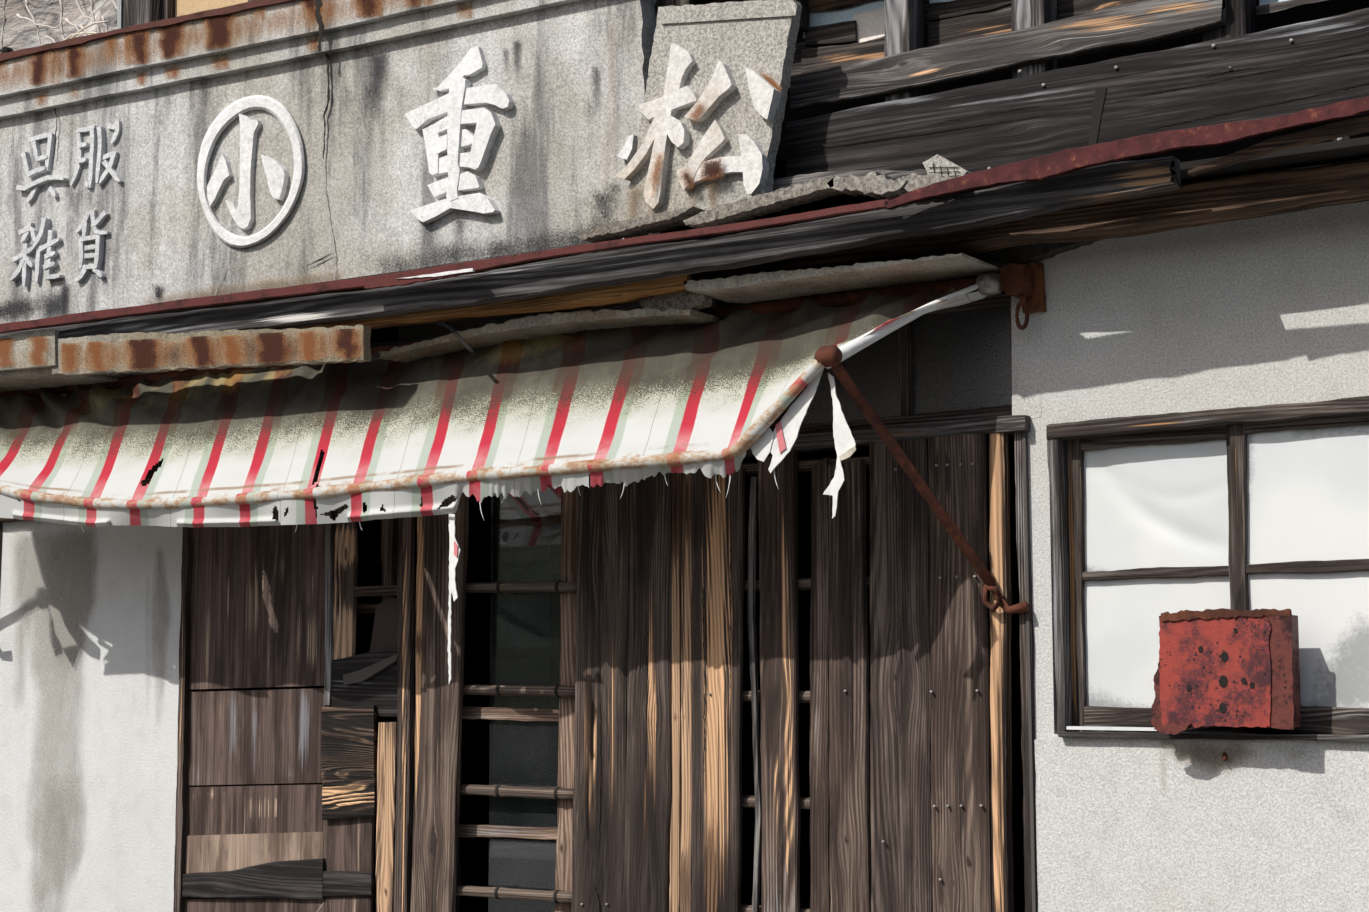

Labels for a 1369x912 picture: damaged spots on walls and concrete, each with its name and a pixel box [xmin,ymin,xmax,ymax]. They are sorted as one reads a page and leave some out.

corrosion [0,0,433,105]
crack [307,0,335,280]
corrosion [630,154,664,218]
corrosion [679,158,723,204]
corrosion [0,328,363,372]
leakage [19,532,89,883]